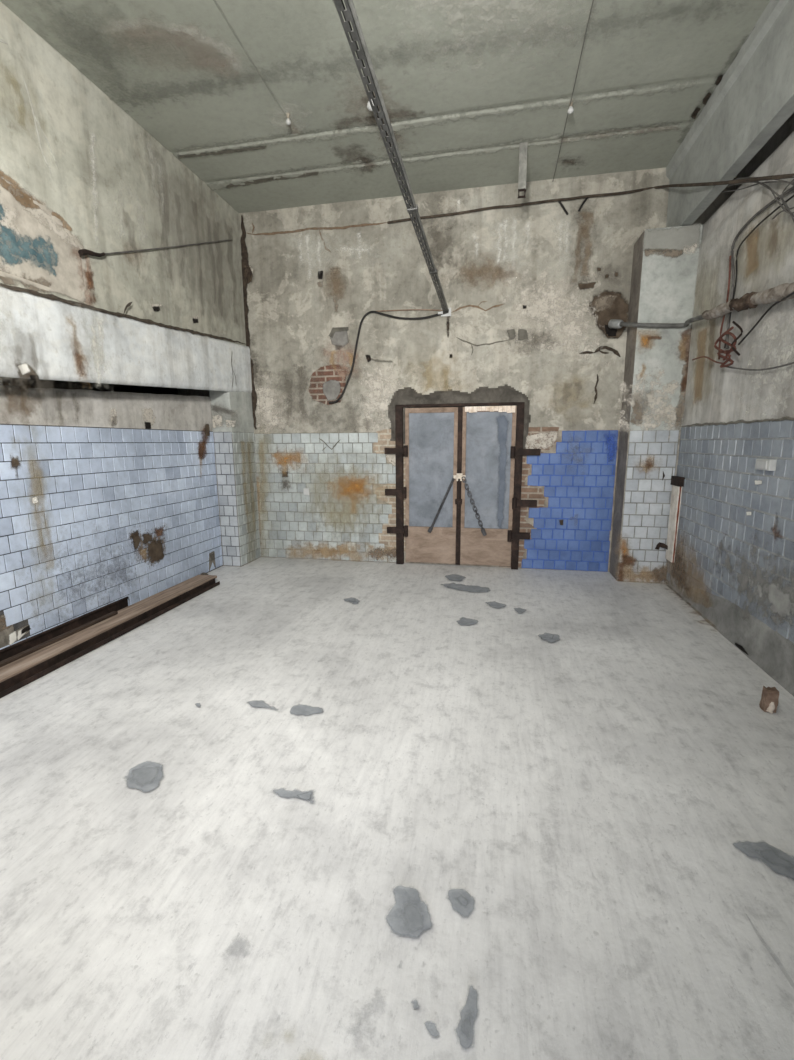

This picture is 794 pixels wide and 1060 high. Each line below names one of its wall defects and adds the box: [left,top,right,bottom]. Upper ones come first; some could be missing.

peeling [0,171,88,302]
peeling [503,268,629,359]
corrosion [198,424,210,459]
peeling [308,353,406,553]
peeling [499,427,559,568]
spalling [129,526,166,566]
corrosion [618,545,634,582]
peeling [0,615,31,648]